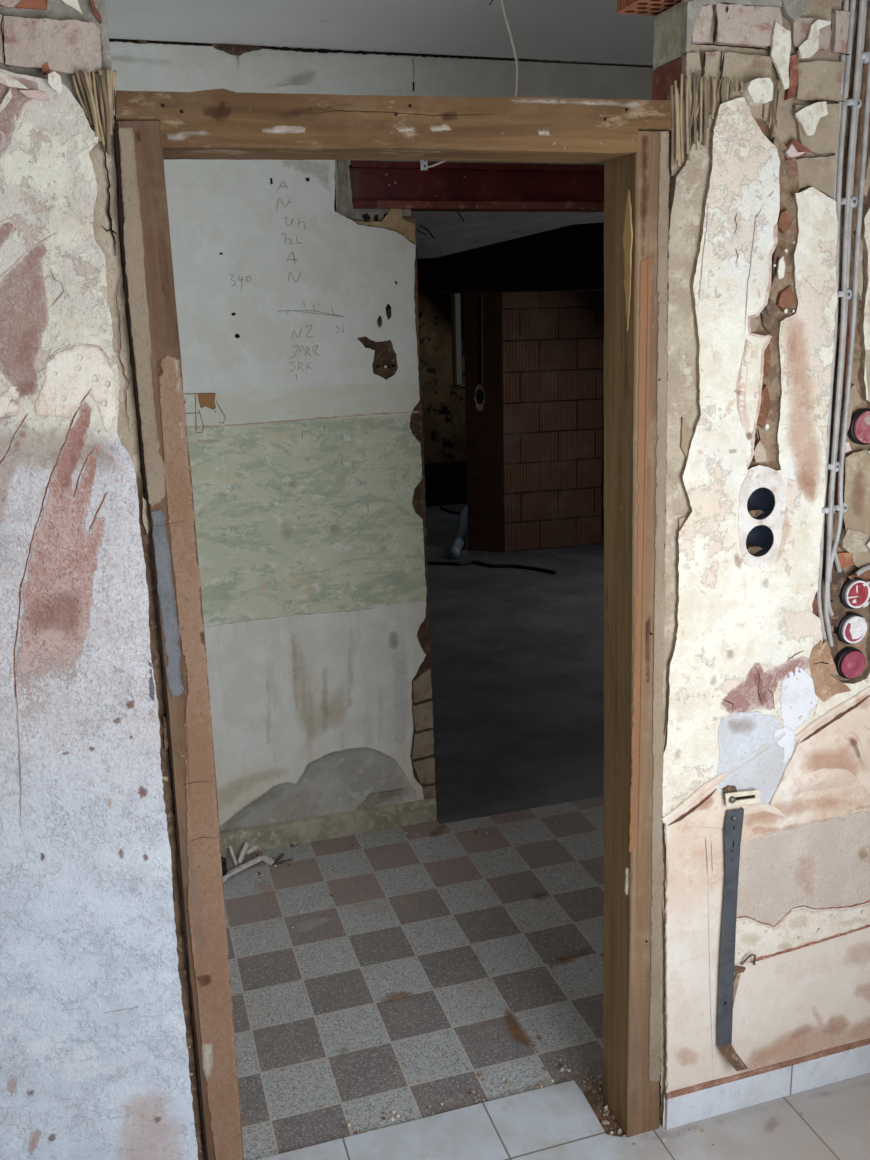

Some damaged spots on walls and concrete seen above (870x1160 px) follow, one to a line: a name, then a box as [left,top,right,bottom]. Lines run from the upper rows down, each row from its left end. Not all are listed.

peeling [0,0,436,1160]
peeling [629,257,652,852]
flaking render [652,0,859,745]
spalling [843,450,870,550]
peeling [717,640,838,805]
spalling [659,841,669,1122]
peeling [735,811,870,964]